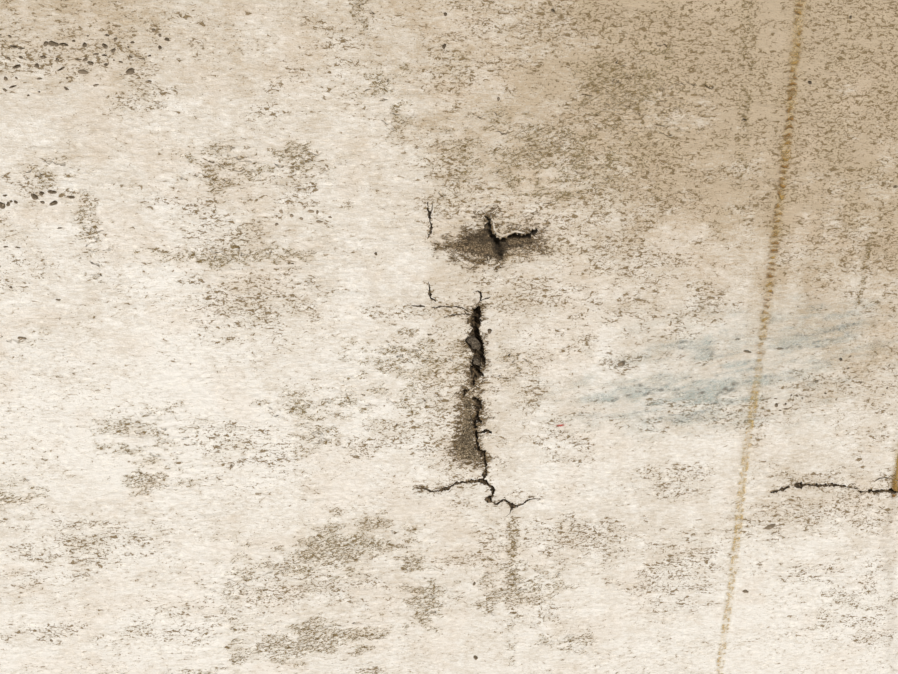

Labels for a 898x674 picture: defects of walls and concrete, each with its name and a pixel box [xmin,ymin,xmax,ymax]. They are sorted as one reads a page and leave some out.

rust [760,61,798,344]
crack [412,282,540,516]
crack [771,477,898,495]